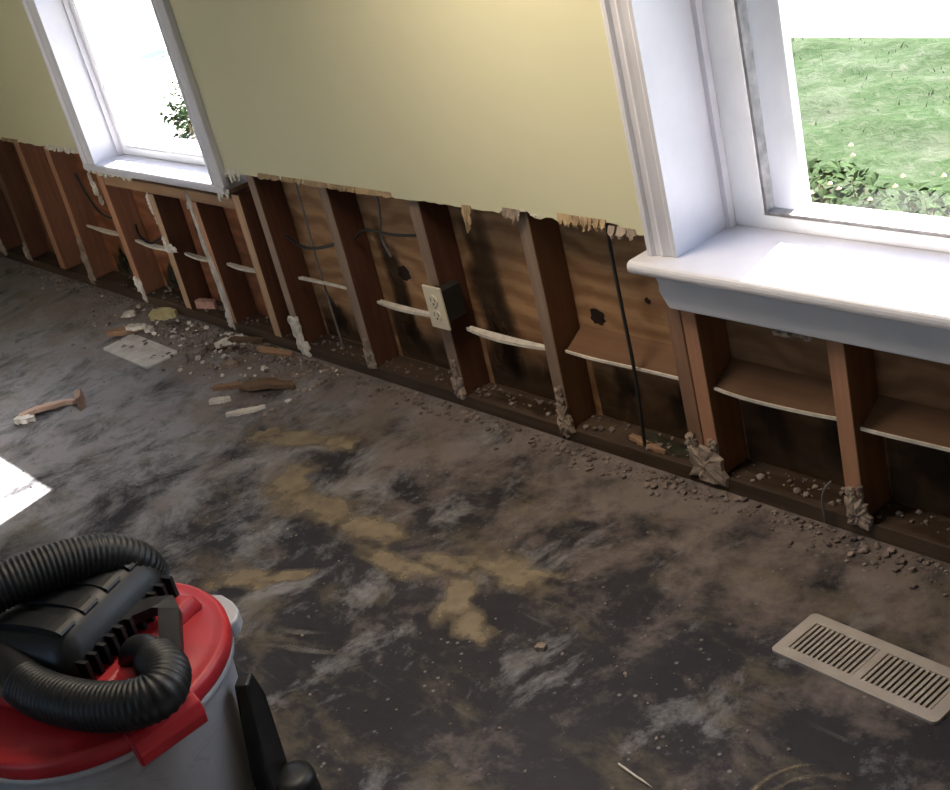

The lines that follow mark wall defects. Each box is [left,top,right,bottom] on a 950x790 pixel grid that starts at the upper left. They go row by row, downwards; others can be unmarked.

peeling [264,174,392,198]
peeling [161,236,178,253]
peeling [185,190,236,330]
peeling [133,276,148,303]
peeling [287,316,312,357]
leakage [378,236,451,370]
leakage [466,231,557,415]
peeling [449,358,467,400]
flaking render [14,414,36,425]
peeling [554,386,576,439]
peeling [685,432,730,487]
peeling [844,484,874,531]